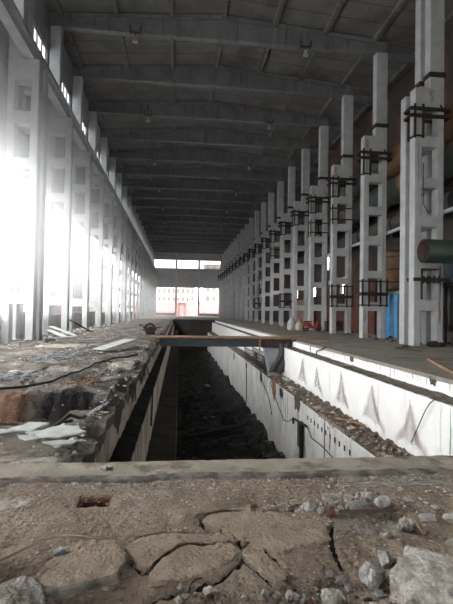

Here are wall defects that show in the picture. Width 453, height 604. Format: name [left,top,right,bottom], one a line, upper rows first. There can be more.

spalling [64,410,92,423]
spalling [281,340,453,456]
crack [183,524,280,566]
crack [324,527,343,571]
crack [152,565,272,604]